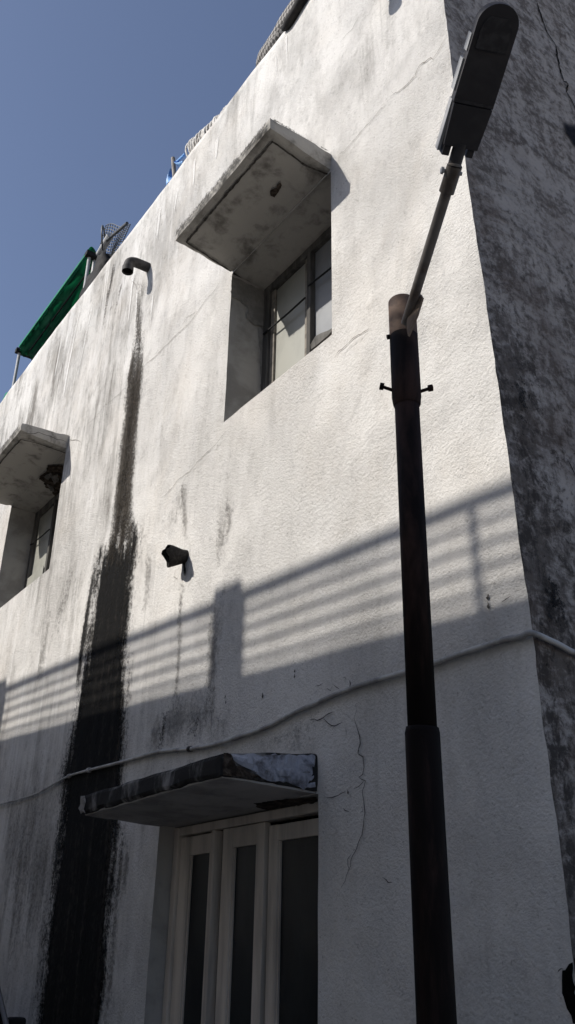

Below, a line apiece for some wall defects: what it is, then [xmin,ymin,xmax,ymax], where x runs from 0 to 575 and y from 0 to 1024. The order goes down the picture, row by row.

water stain [564,123,575,145]
water stain [16,267,153,1024]
crack [310,677,366,898]